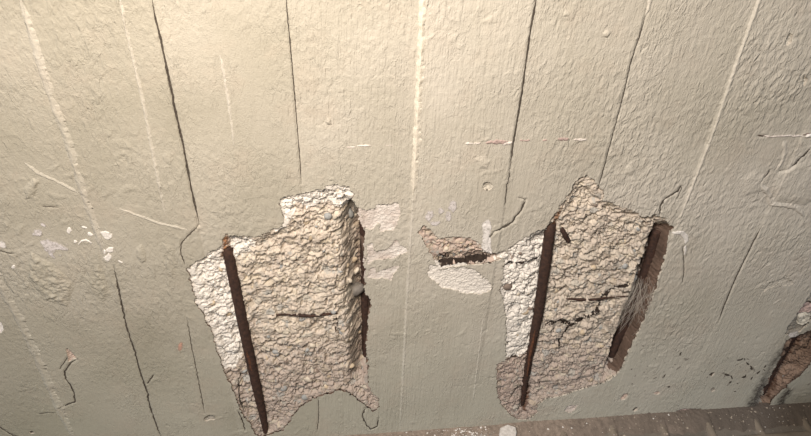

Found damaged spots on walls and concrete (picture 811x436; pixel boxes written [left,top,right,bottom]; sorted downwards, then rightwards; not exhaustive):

crack [152,0,199,264]
crack [286,0,301,175]
crack [489,0,536,237]
crack [597,15,646,190]
crack [114,269,161,436]
crack [187,320,204,408]
spalling [186,184,407,436]
spalling [418,175,689,419]
spalling [701,293,811,403]